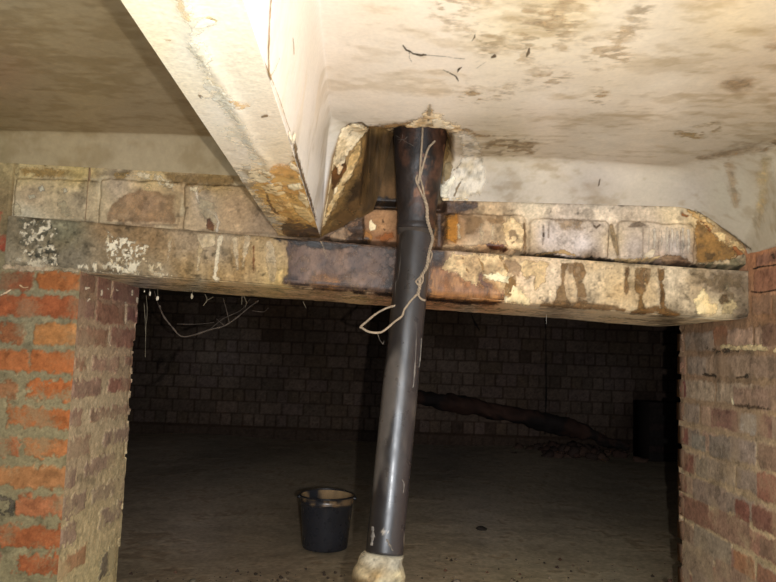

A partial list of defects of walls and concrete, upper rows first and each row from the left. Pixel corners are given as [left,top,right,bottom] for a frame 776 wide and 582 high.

crack [265,0,290,130]
leakage [22,168,64,177]
spalling [237,105,490,242]
leakage [16,218,59,267]
leakage [78,232,173,278]
leakage [108,172,255,282]
corrosion [427,251,504,306]